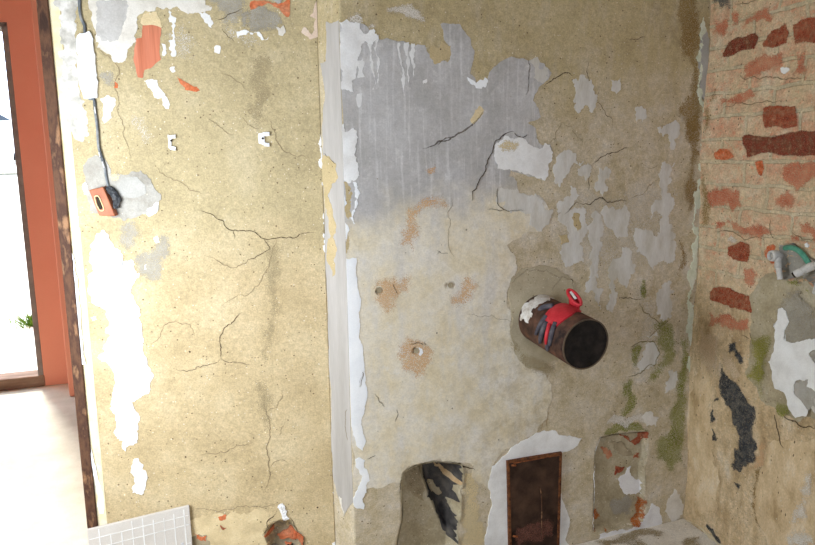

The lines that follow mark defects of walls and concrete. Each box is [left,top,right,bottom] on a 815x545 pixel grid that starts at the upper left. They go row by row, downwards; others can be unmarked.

peeling [88,0,212,78]
flaking render [723,16,815,57]
crack [423,114,482,149]
crack [472,131,527,200]
peeling [494,136,553,181]
crack [569,148,659,210]
flaking render [742,105,815,176]
crack [159,171,313,372]
peeling [87,230,154,451]
peeling [130,458,148,495]
spalling [190,508,304,545]
leakage [597,528,664,545]